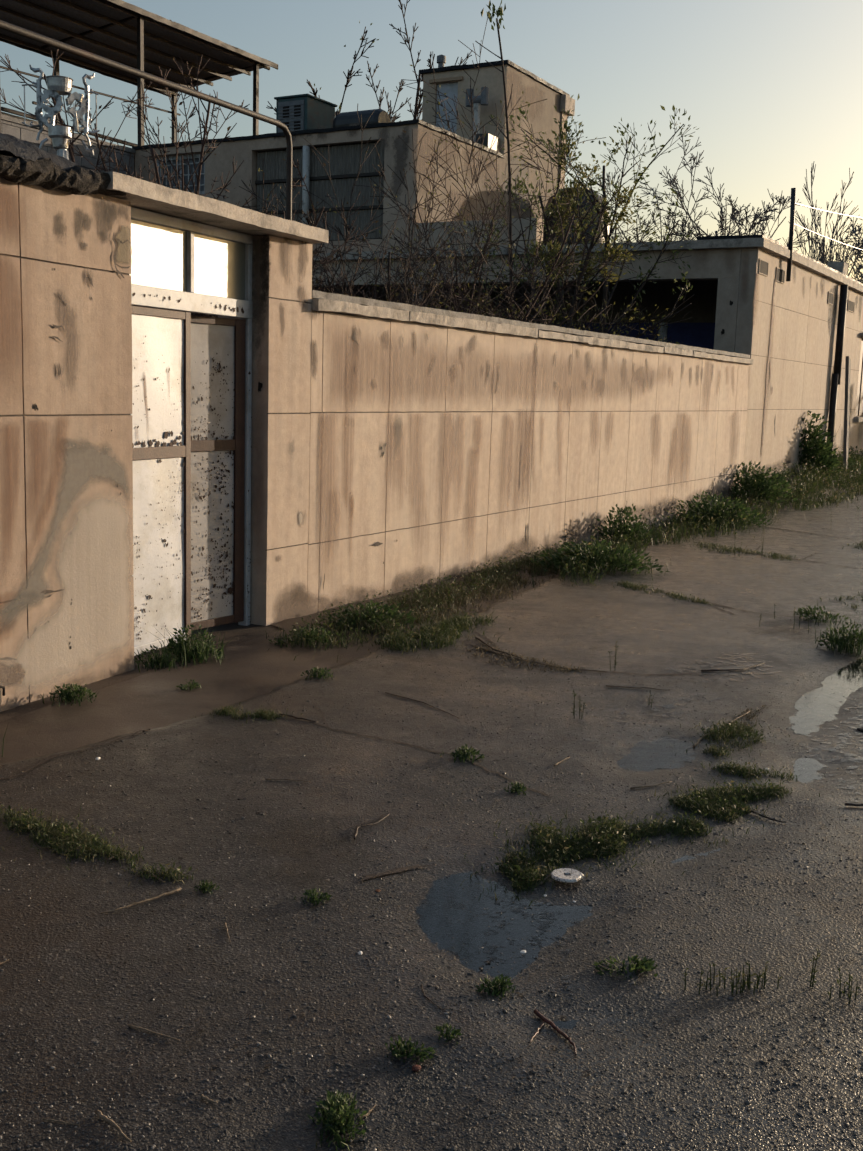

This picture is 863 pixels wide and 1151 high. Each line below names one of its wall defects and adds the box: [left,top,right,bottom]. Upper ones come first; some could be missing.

leakage [0,424,130,706]